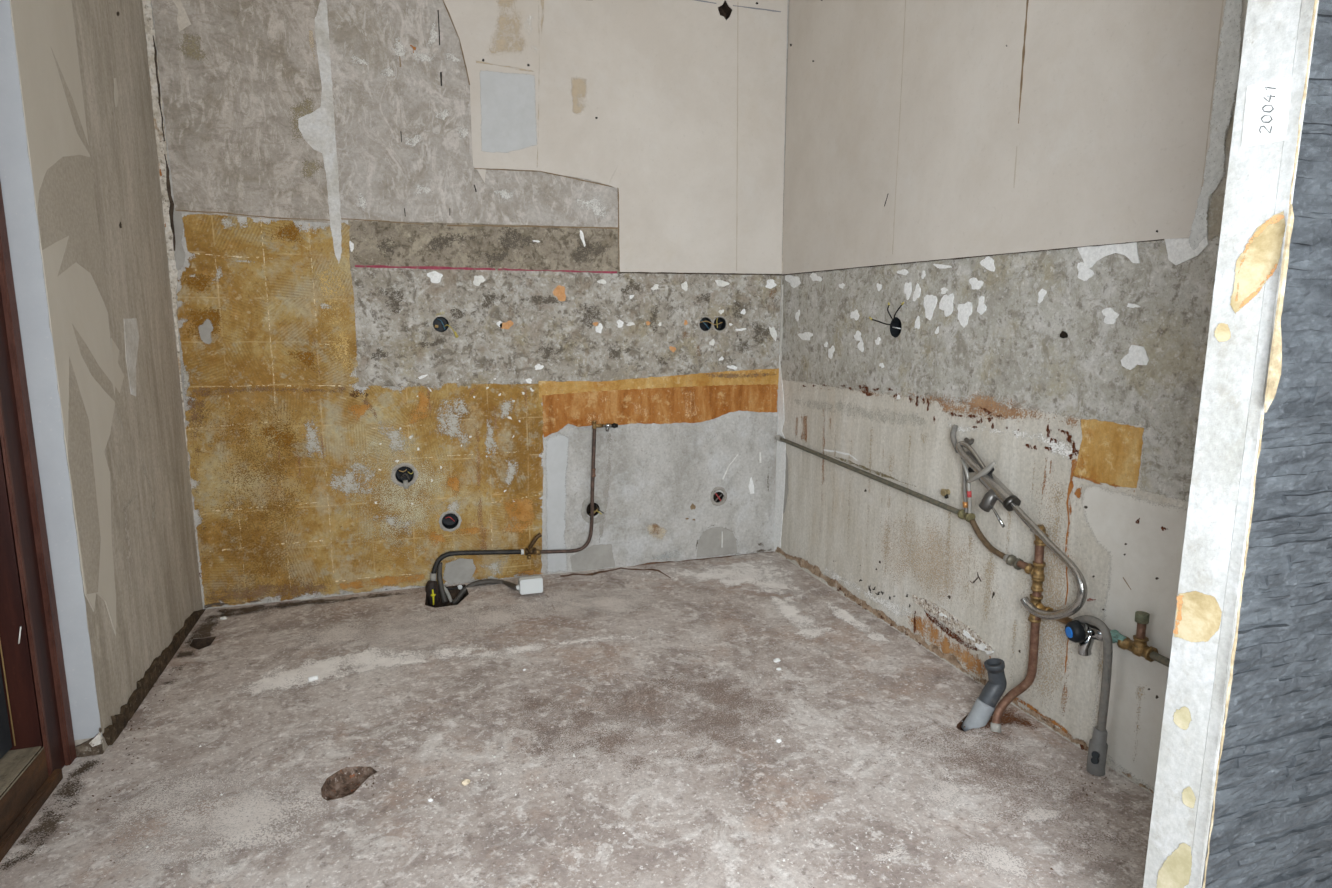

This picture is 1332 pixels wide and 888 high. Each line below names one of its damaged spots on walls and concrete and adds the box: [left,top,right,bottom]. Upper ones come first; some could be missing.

peeling [427,271,443,283]
peeling [553,285,566,301]
peeling [198,319,213,344]
spalling [433,312,459,338]
peeling [593,319,661,334]
peeling [302,364,544,573]
corrosion [795,410,853,534]
corrosion [1031,457,1082,607]
spalling [425,584,469,608]
spalling [775,547,994,685]
spalling [1012,697,1089,752]